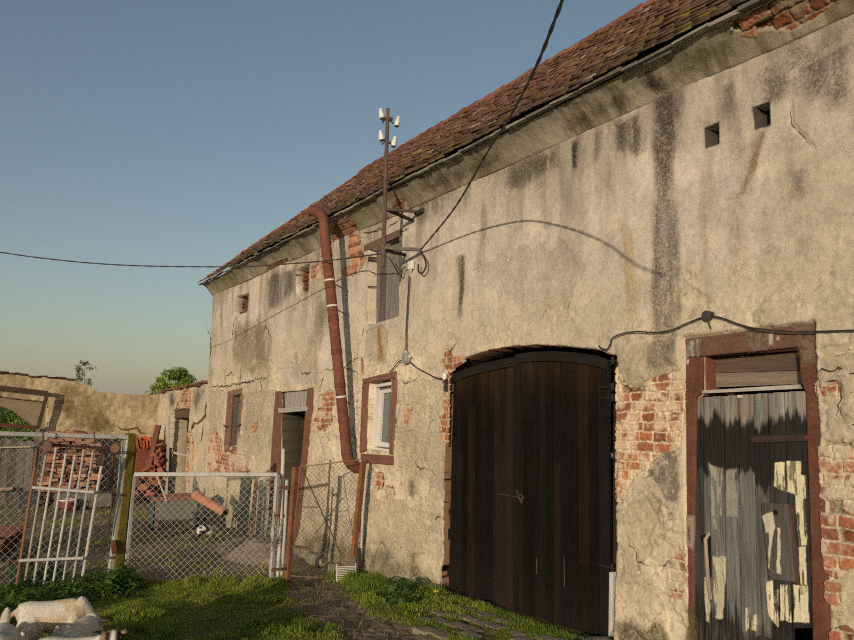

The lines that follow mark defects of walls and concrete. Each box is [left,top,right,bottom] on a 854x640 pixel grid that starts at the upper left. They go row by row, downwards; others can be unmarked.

spalling [727,0,839,37]
leakage [646,72,678,174]
spalling [310,262,324,282]
spalling [331,218,366,277]
spalling [207,393,273,472]
spalling [310,388,335,434]
spalling [396,344,466,494]
spalling [615,339,699,571]
spalling [818,437,854,640]